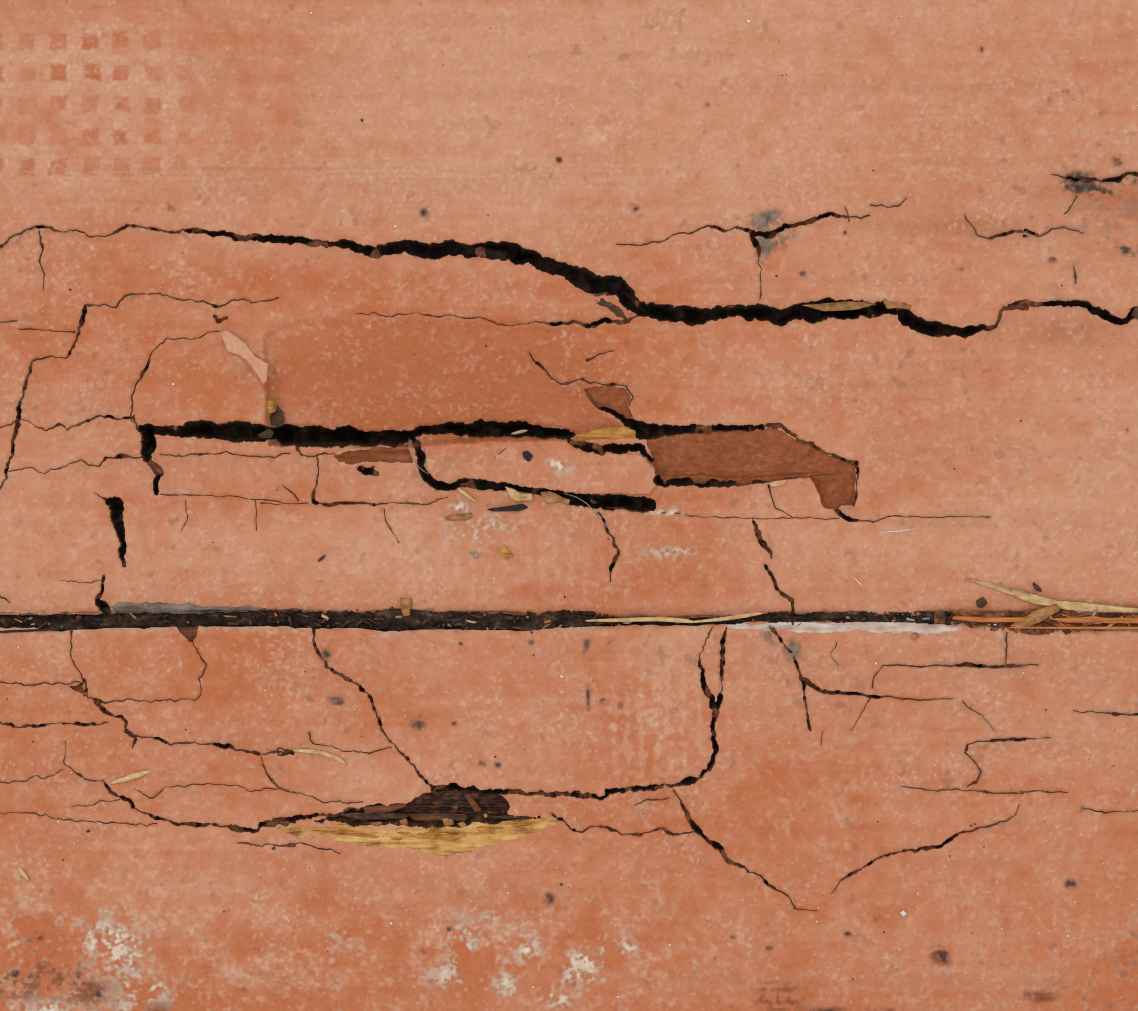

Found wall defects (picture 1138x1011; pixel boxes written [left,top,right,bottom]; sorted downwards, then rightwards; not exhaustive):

crack [964,171,1138,239]
peeling [257,405,284,438]
peeling [585,386,633,418]
peeling [646,428,857,509]
crack [0,198,1138,911]
spalling [314,787,541,829]